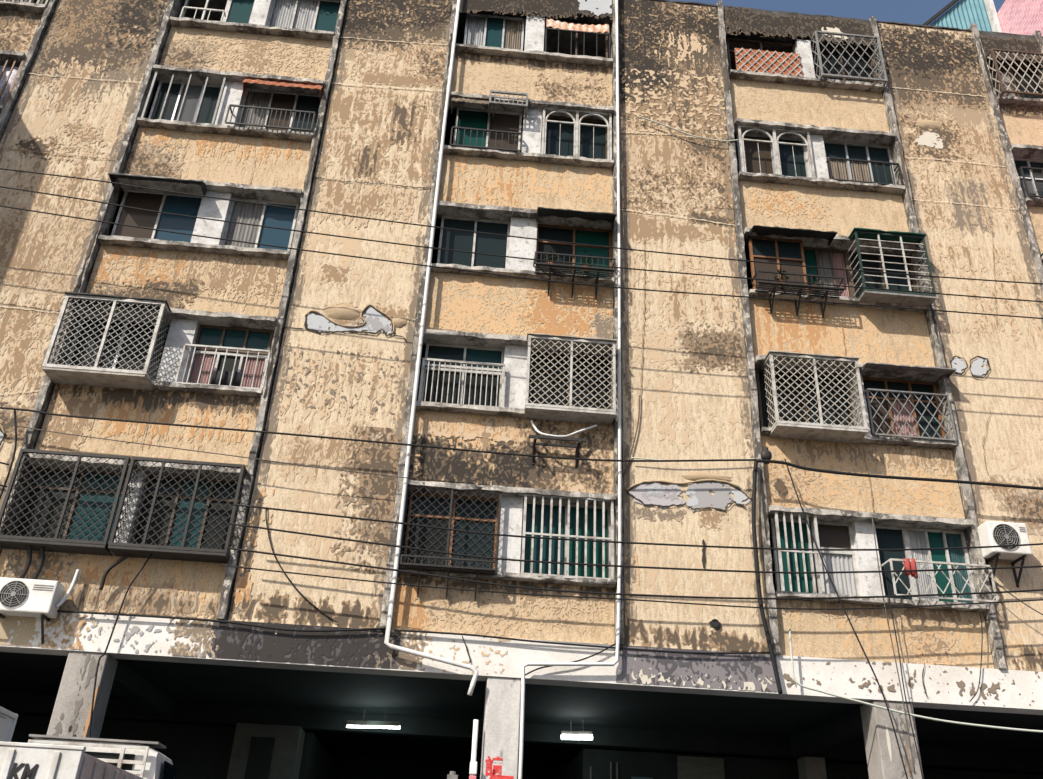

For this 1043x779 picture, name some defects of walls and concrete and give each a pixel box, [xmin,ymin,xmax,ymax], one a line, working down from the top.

peeling [578,0,612,16]
damp [0,0,612,674]
peeling [307,306,392,334]
damp [397,0,1043,652]
peeling [951,357,989,377]
peeling [628,481,751,512]
spalling [845,661,1040,706]